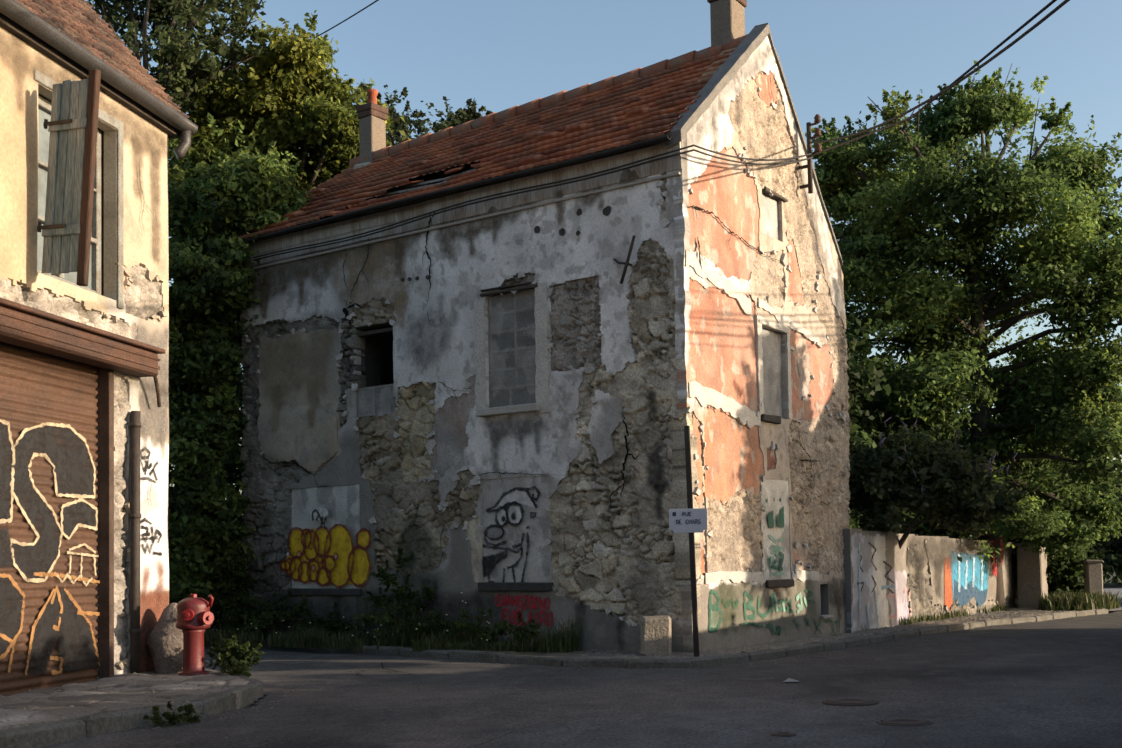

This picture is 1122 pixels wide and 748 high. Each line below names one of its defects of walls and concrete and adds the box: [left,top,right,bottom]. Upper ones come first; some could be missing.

flaking render [0,263,167,340]
flaking render [114,374,131,670]
flaking render [240,298,483,602]
leakage [247,201,536,317]
leakage [582,169,639,208]
flaking render [500,71,851,626]